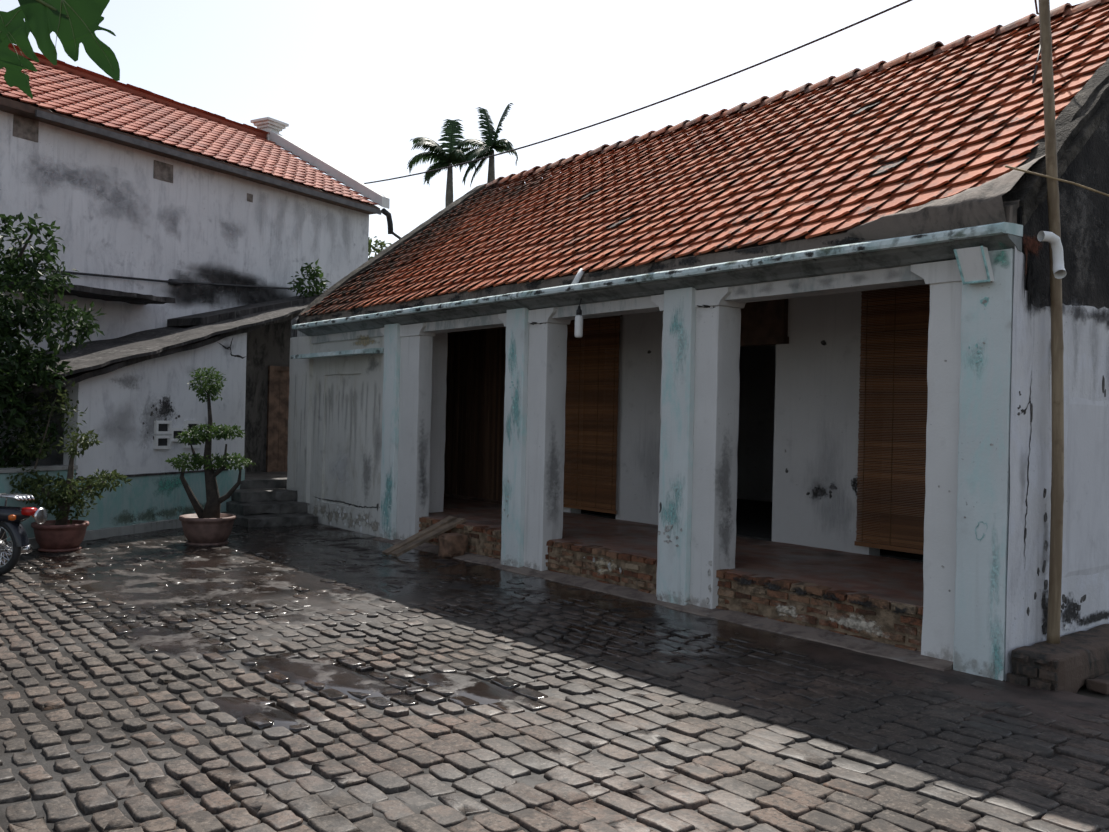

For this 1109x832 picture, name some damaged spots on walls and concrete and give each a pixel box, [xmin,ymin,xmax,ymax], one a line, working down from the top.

damp [1024,251,1045,314]
damp [1062,301,1109,326]
mould [143,397,180,440]
crack [316,497,380,520]